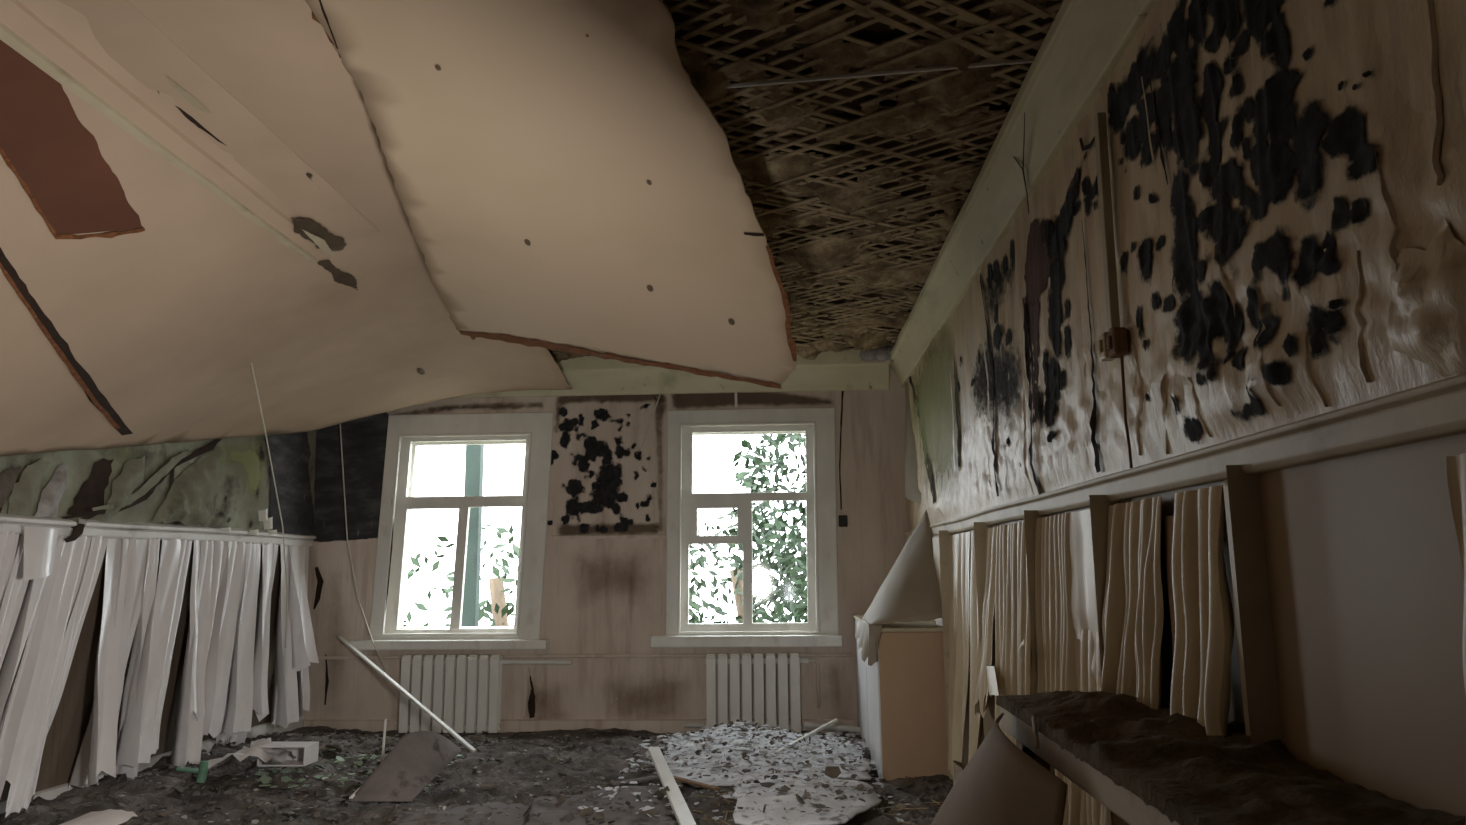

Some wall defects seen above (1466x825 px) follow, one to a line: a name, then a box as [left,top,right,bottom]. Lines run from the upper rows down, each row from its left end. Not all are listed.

peeling [0,40,146,239]
damp [1107,0,1378,422]
crack [0,247,133,435]
damp [956,136,1099,442]
flaking render [0,456,145,520]
crack [62,439,222,525]
flaking render [150,447,231,533]
peeling [249,509,277,535]
damp [249,412,389,542]
damp [411,392,831,535]
damp [1170,395,1202,444]